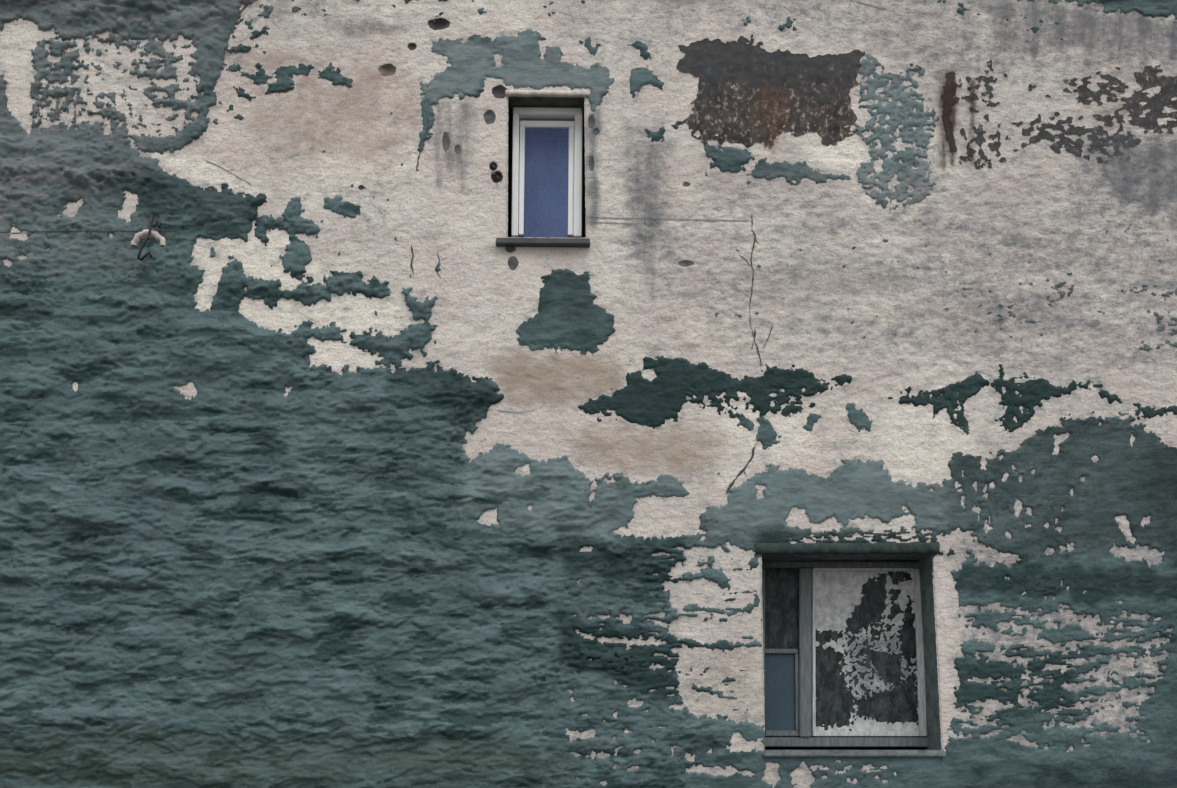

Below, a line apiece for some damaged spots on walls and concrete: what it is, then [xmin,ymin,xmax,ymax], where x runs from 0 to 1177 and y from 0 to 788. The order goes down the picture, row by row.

corrosion [942,82,955,167]
peeling [0,0,1177,541]
crack [590,208,773,363]
peeling [1005,477,1085,555]
peeling [575,542,765,730]
peeling [786,506,1172,752]
peeling [566,728,641,774]
peeling [726,732,765,753]
peeling [671,745,896,788]